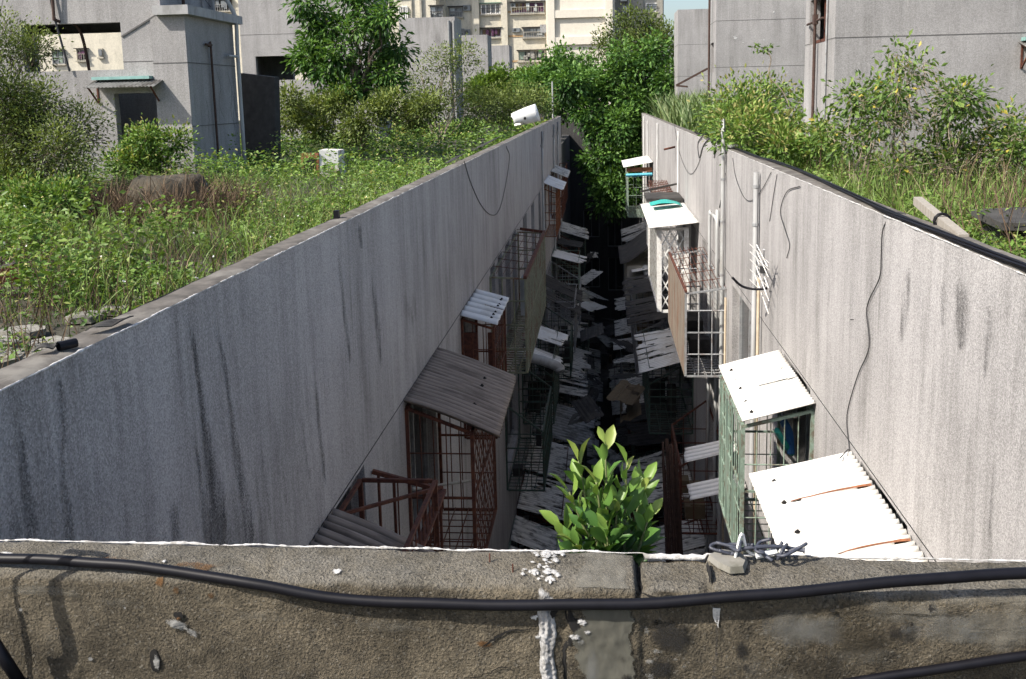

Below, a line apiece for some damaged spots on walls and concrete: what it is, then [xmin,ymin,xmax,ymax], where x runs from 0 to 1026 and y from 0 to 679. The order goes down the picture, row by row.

damp [193,334,228,545]
efflorescence [521,550,564,679]